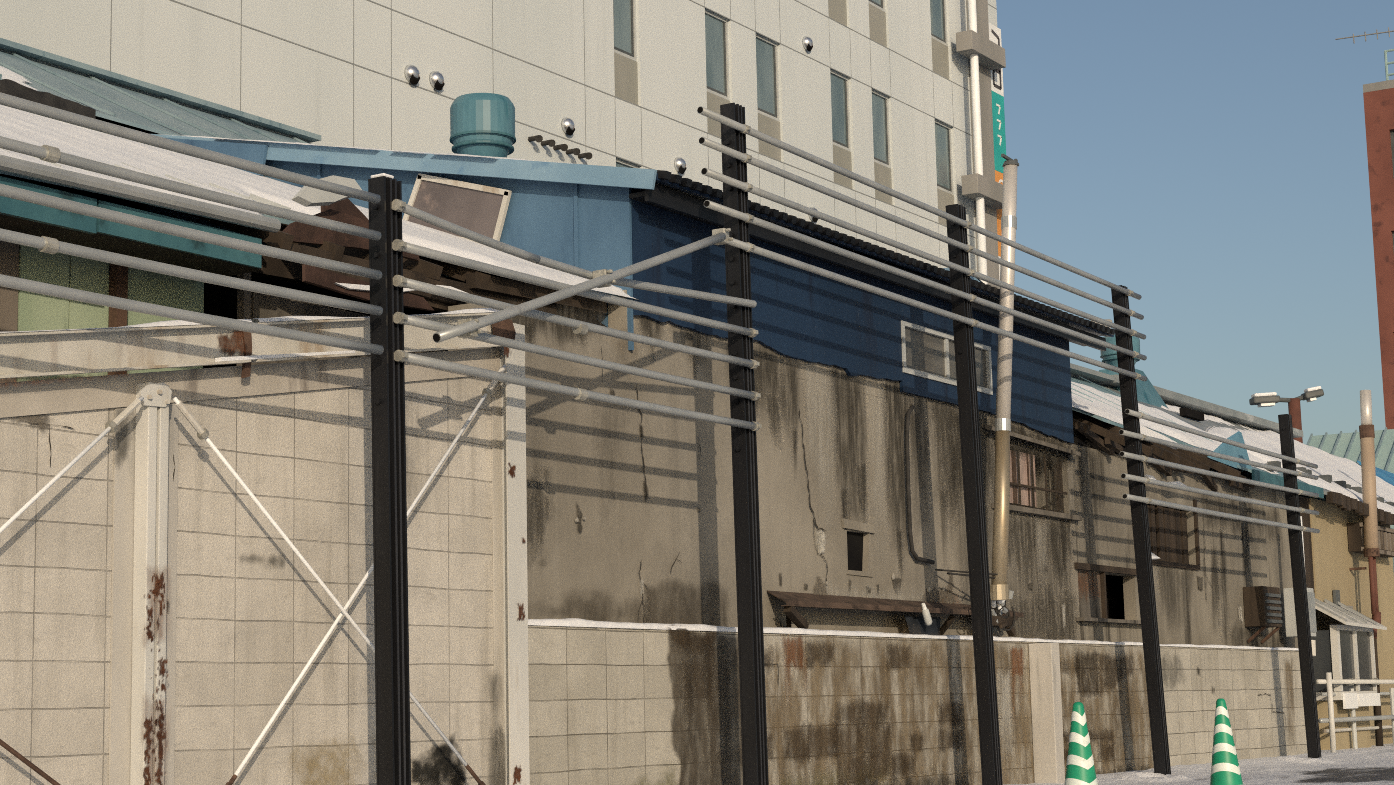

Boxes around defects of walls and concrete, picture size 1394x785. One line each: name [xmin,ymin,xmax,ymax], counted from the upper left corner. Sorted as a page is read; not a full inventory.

leakage [754,350,797,454]
crack [799,410,828,586]
leakage [833,366,865,516]
leakage [886,381,962,560]
leakage [1010,425,1103,503]
leakage [1051,519,1070,573]
leakage [1206,499,1278,599]
rust [143,573,168,785]
leakage [412,738,466,785]
leakage [648,586,743,785]
leakage [764,641,982,785]
leakage [994,645,1034,785]